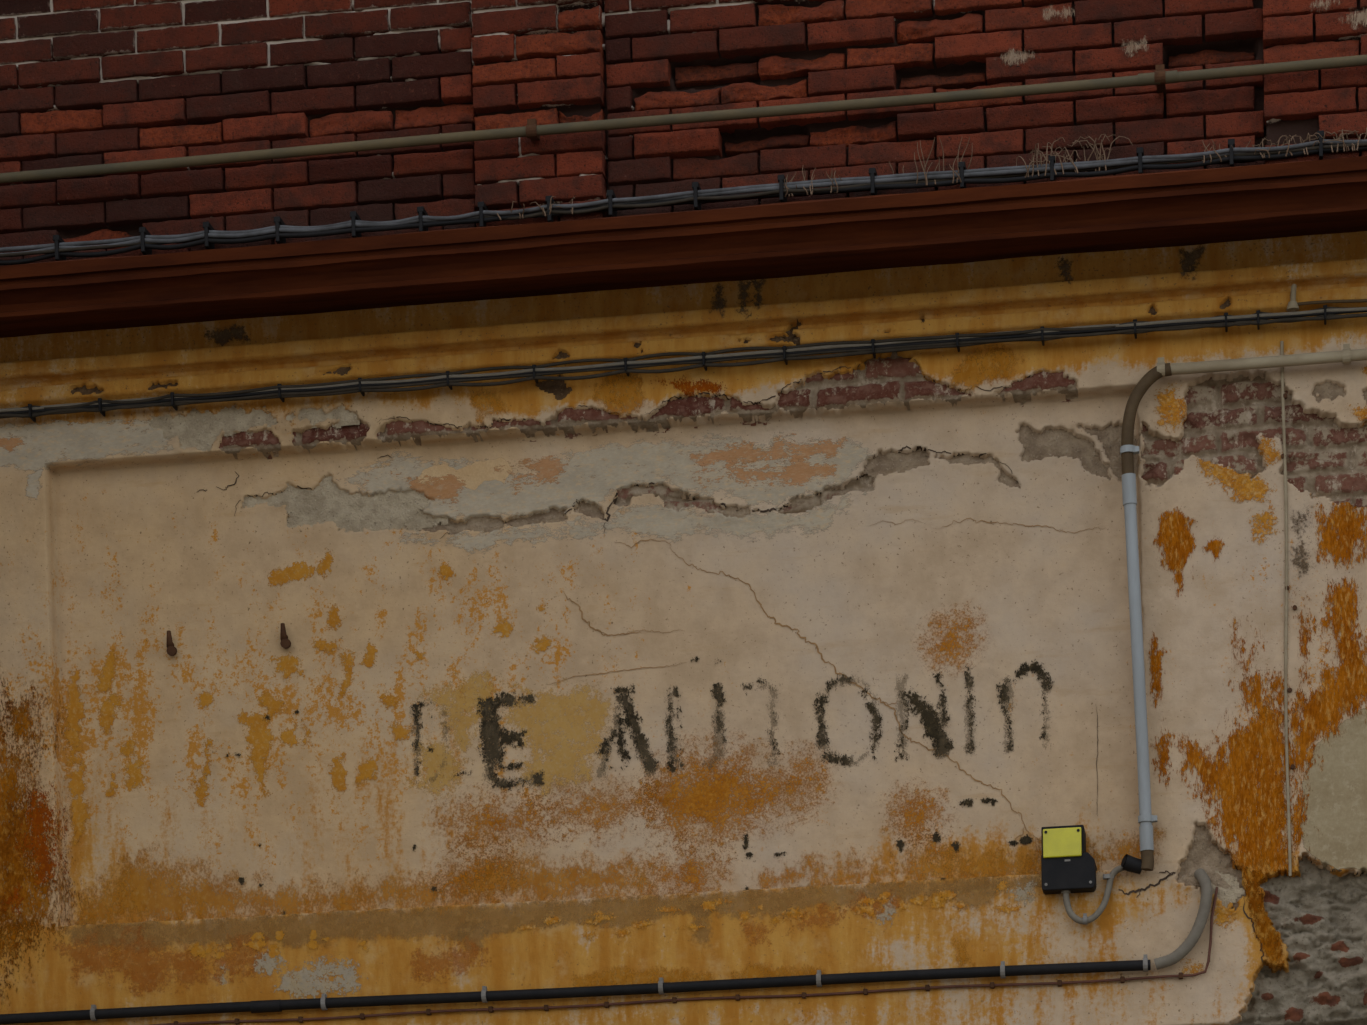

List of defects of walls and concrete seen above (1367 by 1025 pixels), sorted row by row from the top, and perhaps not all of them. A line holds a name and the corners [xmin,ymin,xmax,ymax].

water stain [1001,49,1034,64]
water stain [1313,0,1367,28]
peeling [219,351,1021,589]
crack [870,518,1100,533]
flaking render [1017,375,1367,508]
water stain [1291,506,1313,577]
crack [547,446,1042,843]
peeling [61,649,145,846]
peeling [188,652,313,807]
crack [1093,710,1101,816]
water stain [54,875,1042,996]
flaking render [1176,825,1367,1025]